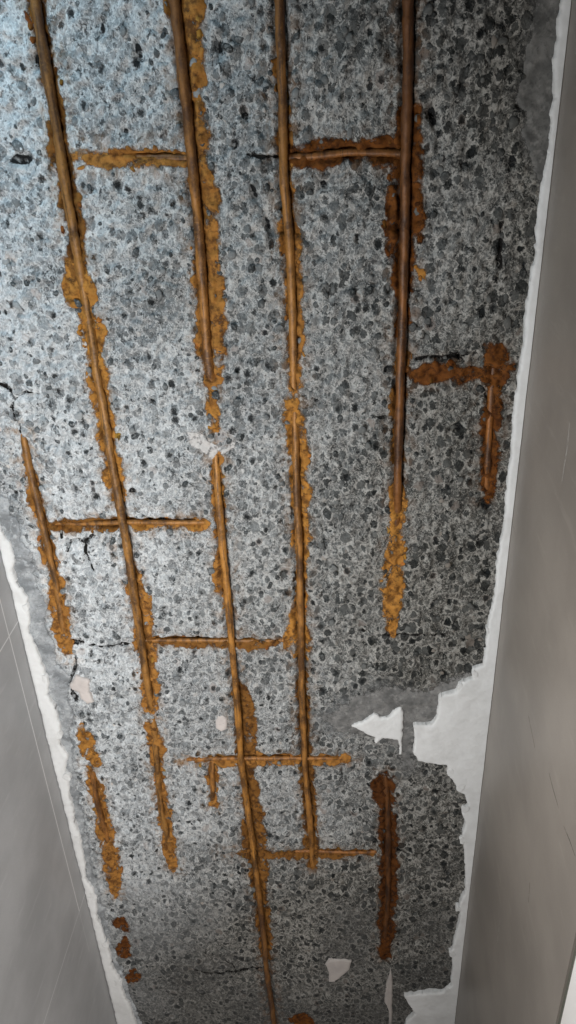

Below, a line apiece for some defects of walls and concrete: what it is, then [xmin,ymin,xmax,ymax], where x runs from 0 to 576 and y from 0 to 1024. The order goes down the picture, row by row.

spalling [284,0,403,151]
corrosion [24,0,229,503]
corrosion [21,450,233,655]
spalling [0,0,272,1024]
corrosion [125,57,427,961]
corrosion [388,343,516,504]
peeling [404,0,571,1024]
corrosion [76,722,123,899]
spalling [252,761,308,854]
peeling [352,707,403,754]
corrosion [112,917,141,983]
peeling [325,958,352,982]